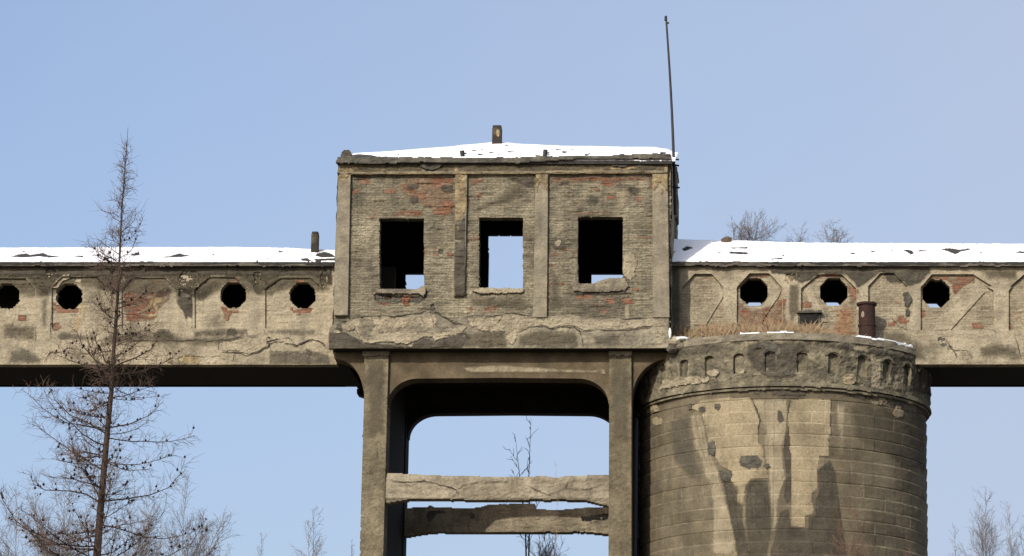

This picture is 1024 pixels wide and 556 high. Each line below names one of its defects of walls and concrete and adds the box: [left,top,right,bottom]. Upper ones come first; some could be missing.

peeling [574,253,639,304]
damp [5,325,39,362]
flaking render [124,280,183,321]
damp [106,328,255,344]
crack [132,329,327,362]
peeling [336,293,666,347]
spalling [659,368,720,390]
damp [826,335,932,471]
damp [668,343,846,556]
spalling [788,398,831,527]
crack [392,480,498,494]
spalling [581,513,609,521]